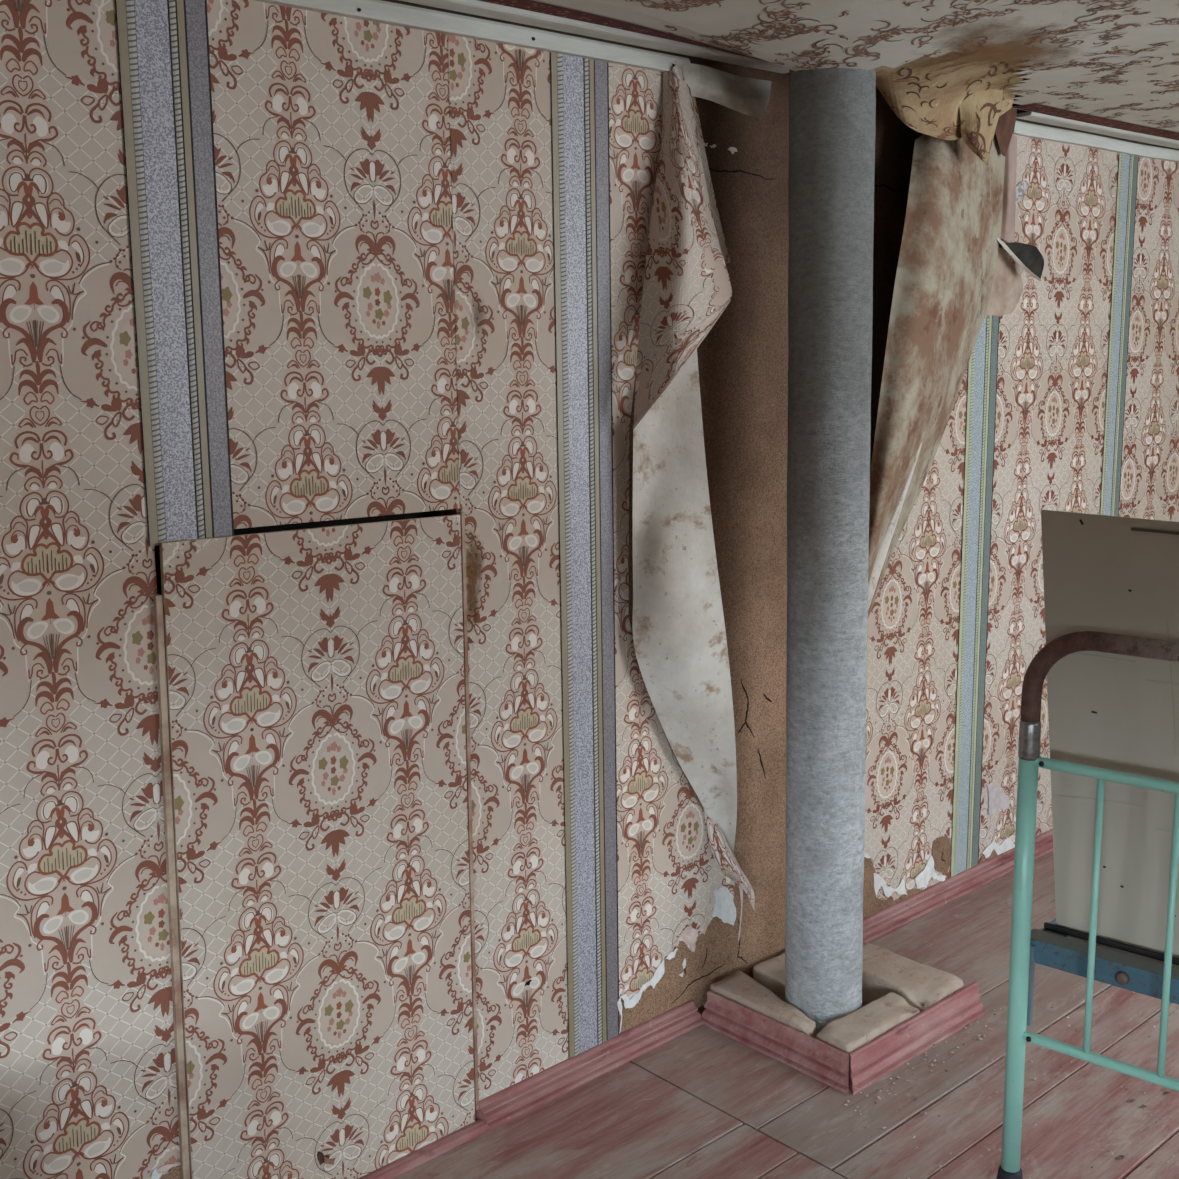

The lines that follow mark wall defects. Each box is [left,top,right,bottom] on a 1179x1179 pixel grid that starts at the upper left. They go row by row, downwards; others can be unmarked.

leakage [921,25,1069,70]
peeling [870,126,923,471]
peeling [619,61,789,1033]
crack [738,680,772,779]
peeling [863,836,952,919]
peeling [151,1162,181,1179]